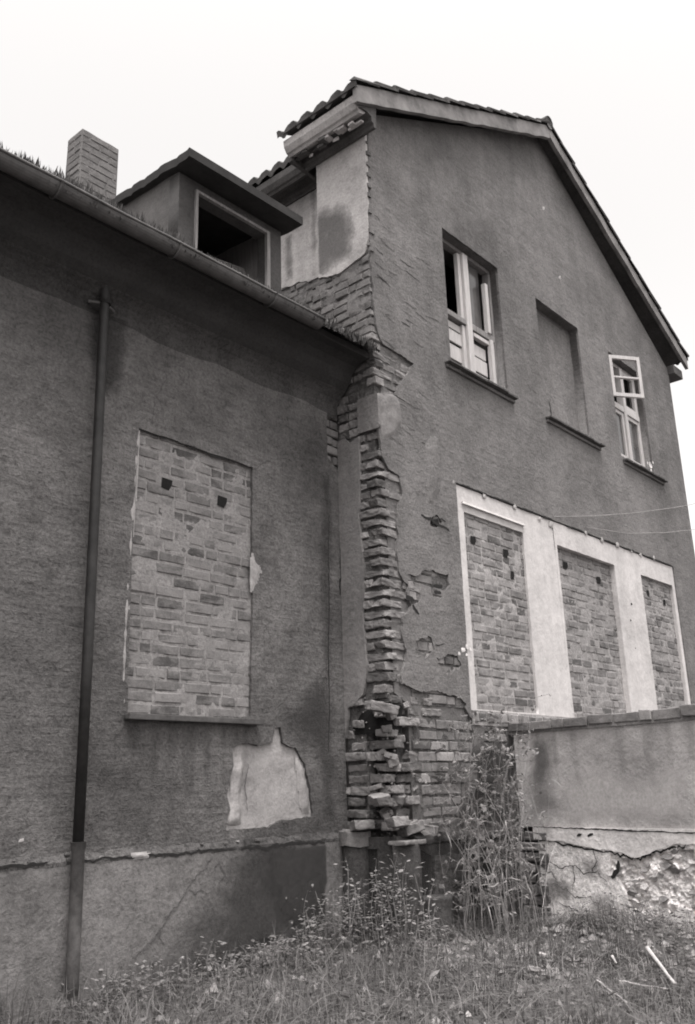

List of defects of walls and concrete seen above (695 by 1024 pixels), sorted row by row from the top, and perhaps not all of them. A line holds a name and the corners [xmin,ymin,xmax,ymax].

leakage [318,212,349,273]
spalling [281,228,460,683]
flaking render [226,727,311,830]
flaking render [411,689,508,825]
crack [0,837,325,959]
flaking render [606,848,695,918]